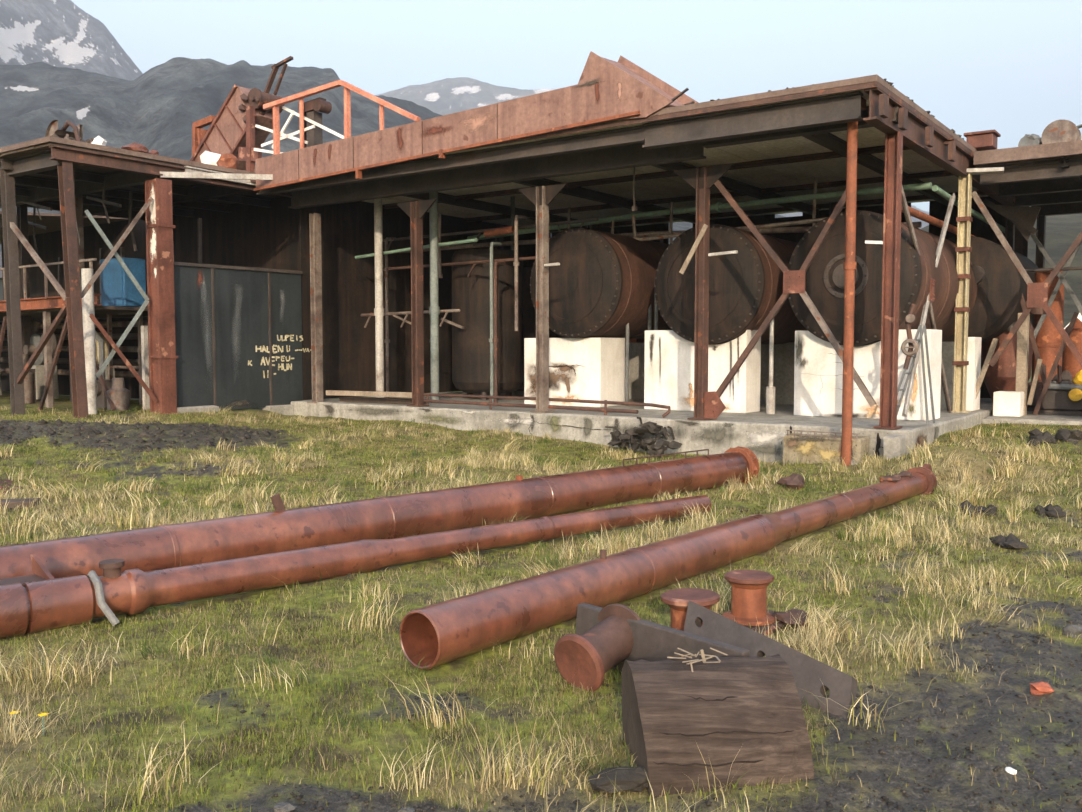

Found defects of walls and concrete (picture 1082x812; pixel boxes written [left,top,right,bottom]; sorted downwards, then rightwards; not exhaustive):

leakage [650,334,661,374]